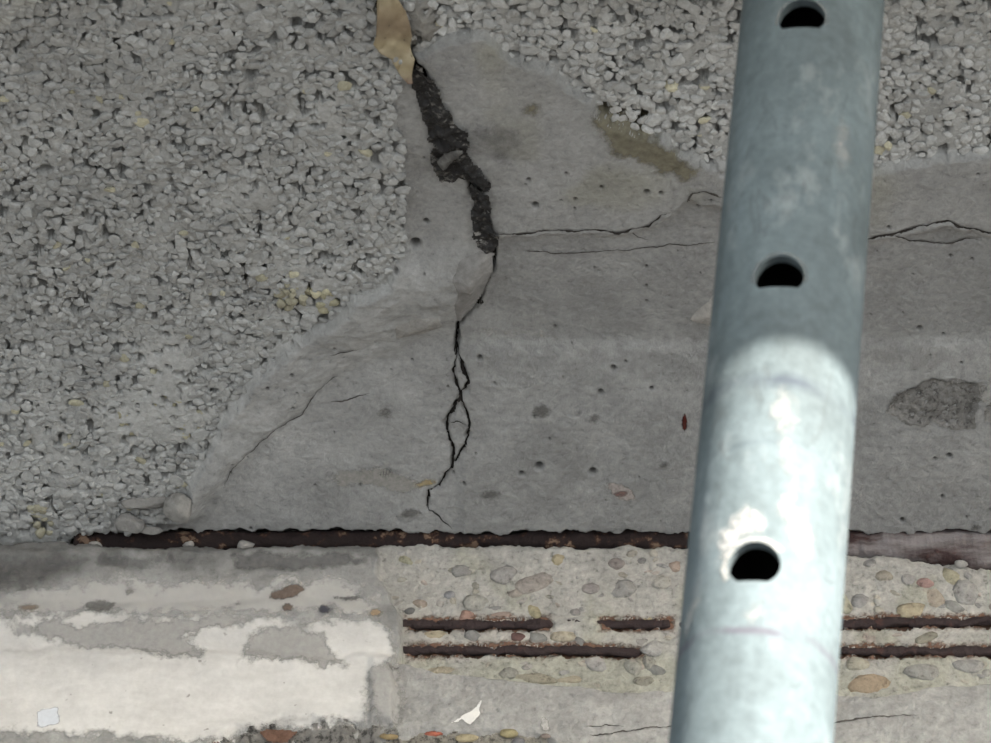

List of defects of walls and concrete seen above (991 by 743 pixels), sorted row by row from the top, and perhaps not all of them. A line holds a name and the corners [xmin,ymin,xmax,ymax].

crack [411,49,427,77]
crack [869,220,991,244]
crack [426,321,471,525]
damp [231,549,363,570]
rust [73,529,688,550]
rust [846,528,991,570]
damp [85,600,114,611]
damp [269,584,304,611]
spalling [841,616,991,630]
rust [405,614,675,661]
spalling [403,645,642,659]
spalling [840,645,991,658]